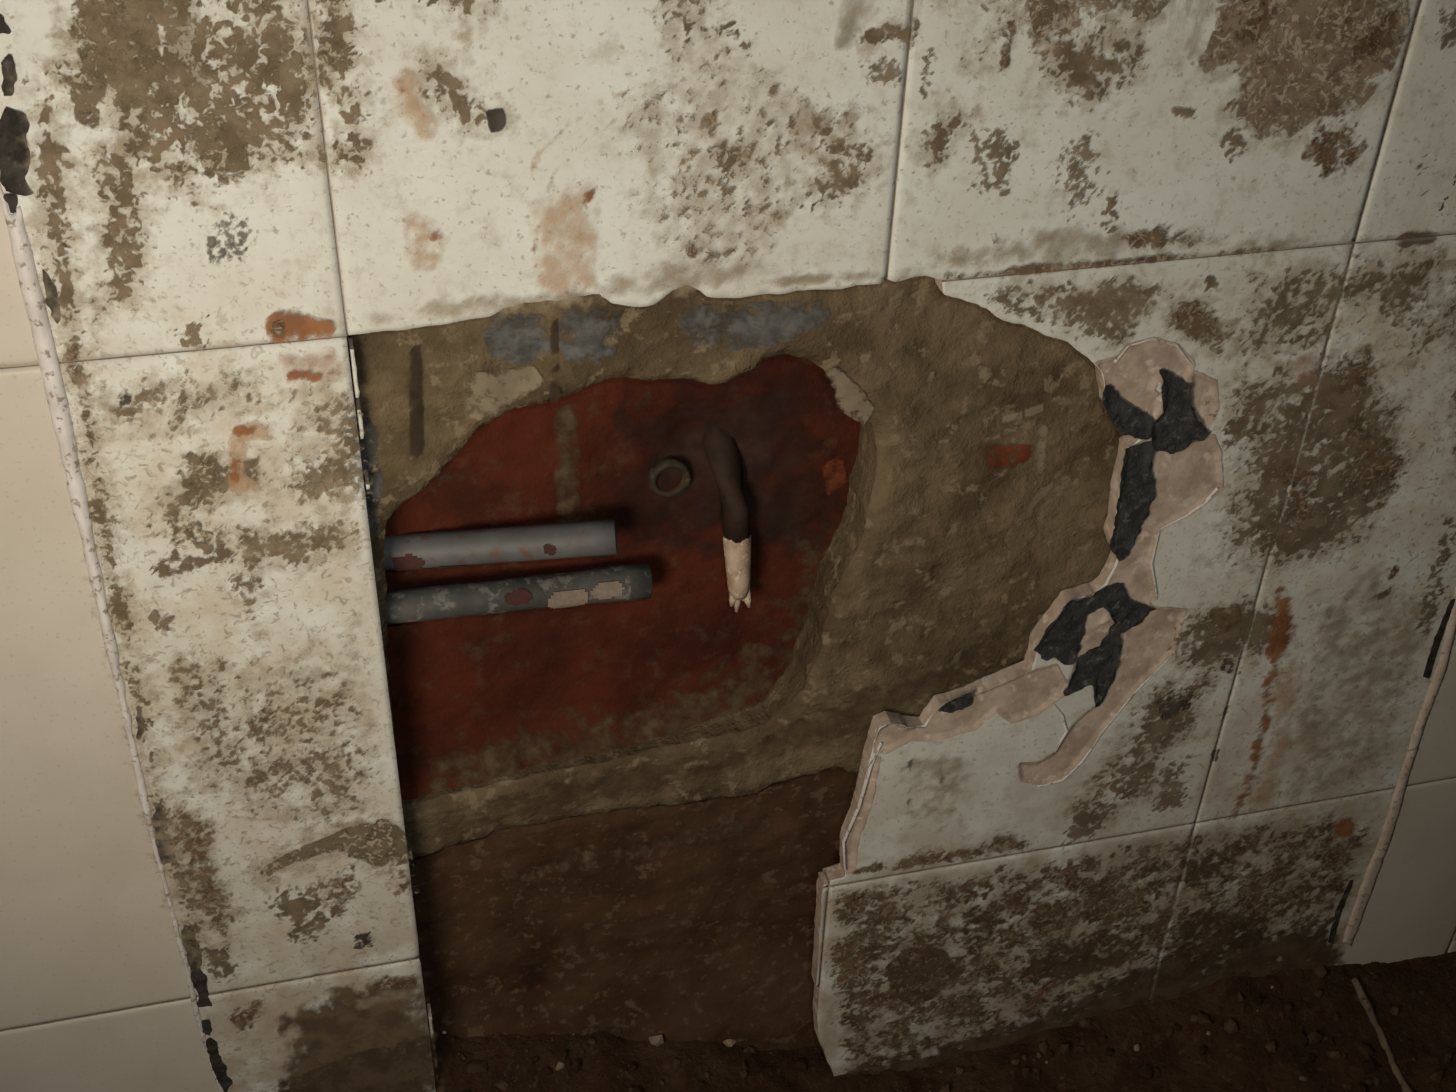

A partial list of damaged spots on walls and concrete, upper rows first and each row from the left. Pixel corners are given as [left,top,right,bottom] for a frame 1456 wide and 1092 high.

damp [416,54,506,134]
damp [622,0,879,289]
damp [835,6,934,100]
damp [913,98,1019,197]
damp [22,0,419,983]
rust [265,311,335,344]
rust [287,358,331,382]
damp [944,0,1456,573]
spalling [347,276,1223,1051]
damp [824,595,1369,1071]
rust [1229,588,1295,819]
damp [1299,518,1456,786]